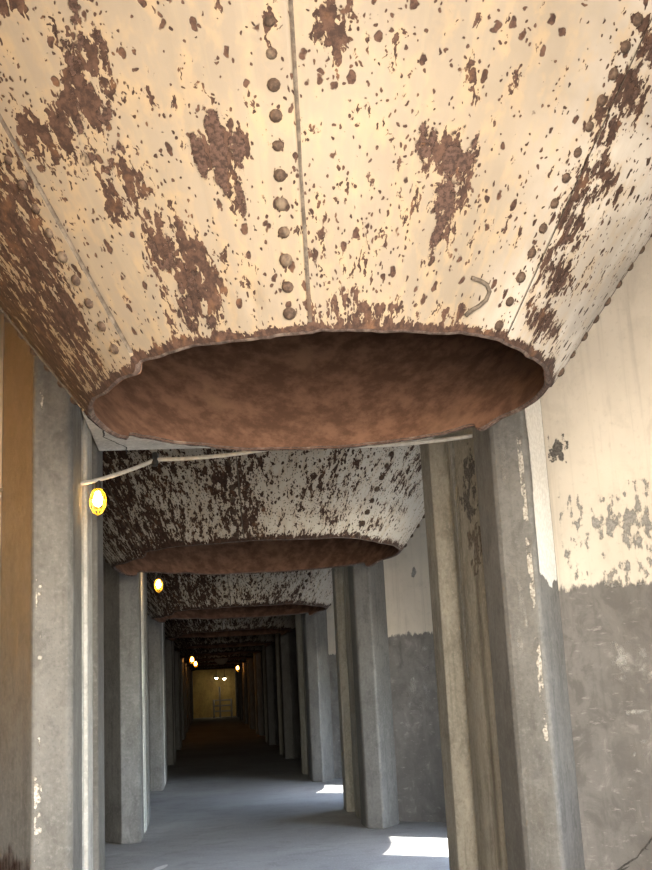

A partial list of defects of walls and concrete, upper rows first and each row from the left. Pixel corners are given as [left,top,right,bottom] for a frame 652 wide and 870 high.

corrosion [55,0,84,77]
corrosion [70,91,126,175]
corrosion [190,109,247,218]
corrosion [415,120,479,259]
corrosion [531,37,652,344]
corrosion [149,234,217,332]
peeling [516,399,652,608]